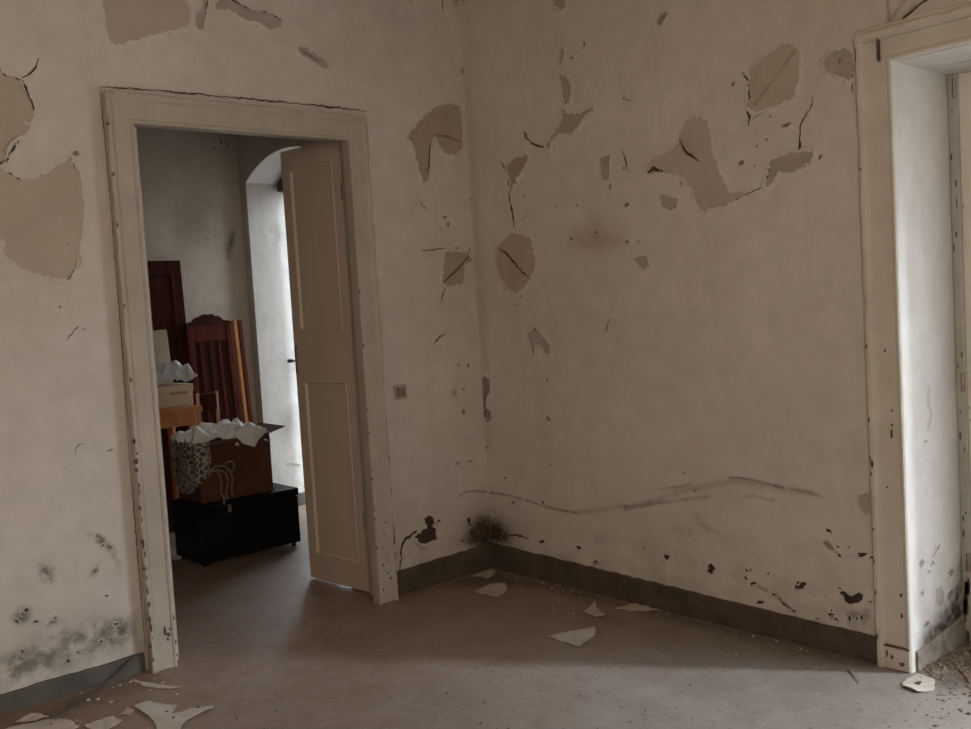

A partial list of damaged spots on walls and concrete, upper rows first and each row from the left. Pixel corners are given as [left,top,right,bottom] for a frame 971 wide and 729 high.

peeling [95,0,286,51]
crack [902,0,928,19]
peeling [818,42,857,94]
peeling [405,98,466,186]
peeling [641,37,824,217]
peeling [0,58,91,286]
peeling [493,41,597,306]
peeling [422,246,475,301]
spalling [374,508,442,591]
mould [459,516,529,546]
mould [926,587,962,641]